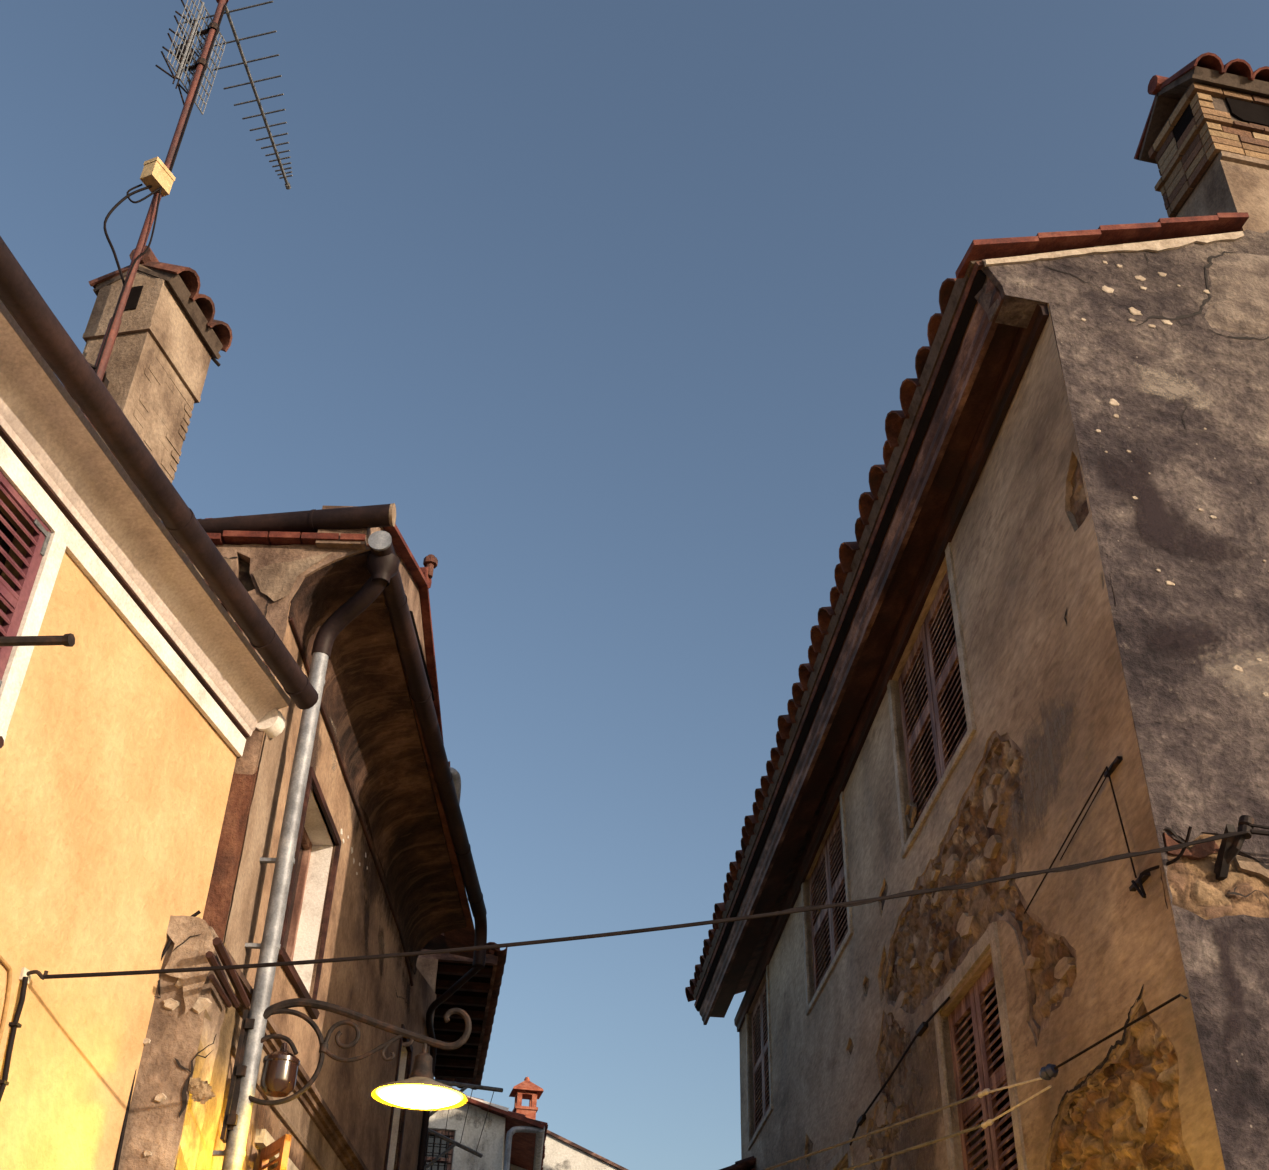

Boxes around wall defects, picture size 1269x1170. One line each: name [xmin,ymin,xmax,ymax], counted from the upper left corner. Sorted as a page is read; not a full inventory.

crack [1134,251,1269,346]
leakage [1140,366,1210,408]
leakage [1104,457,1242,560]
spalling [1160,826,1269,921]
flaking render [163,978,212,1014]
spalling [864,731,1077,1170]
spalling [188,1077,216,1104]
spalling [1047,998,1194,1170]